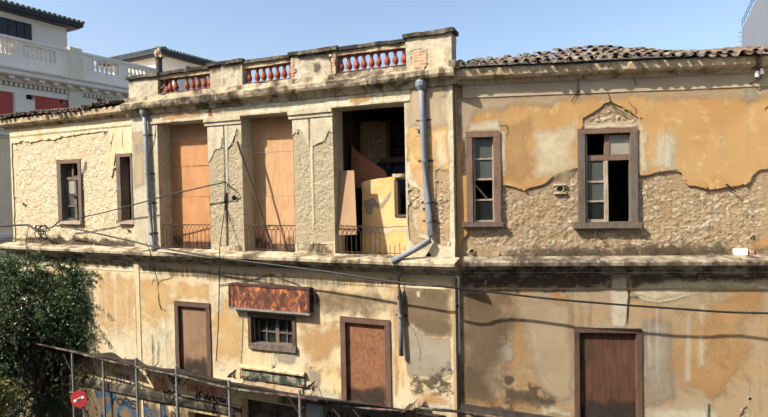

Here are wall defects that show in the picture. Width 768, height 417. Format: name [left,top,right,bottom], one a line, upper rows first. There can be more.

spalling [410,46,446,70]
crack [605,77,637,116]
spalling [209,129,245,250]
spalling [293,130,335,253]
spalling [364,87,768,258]
leakage [271,353,295,365]
leakage [301,272,636,417]
leakage [643,321,718,417]